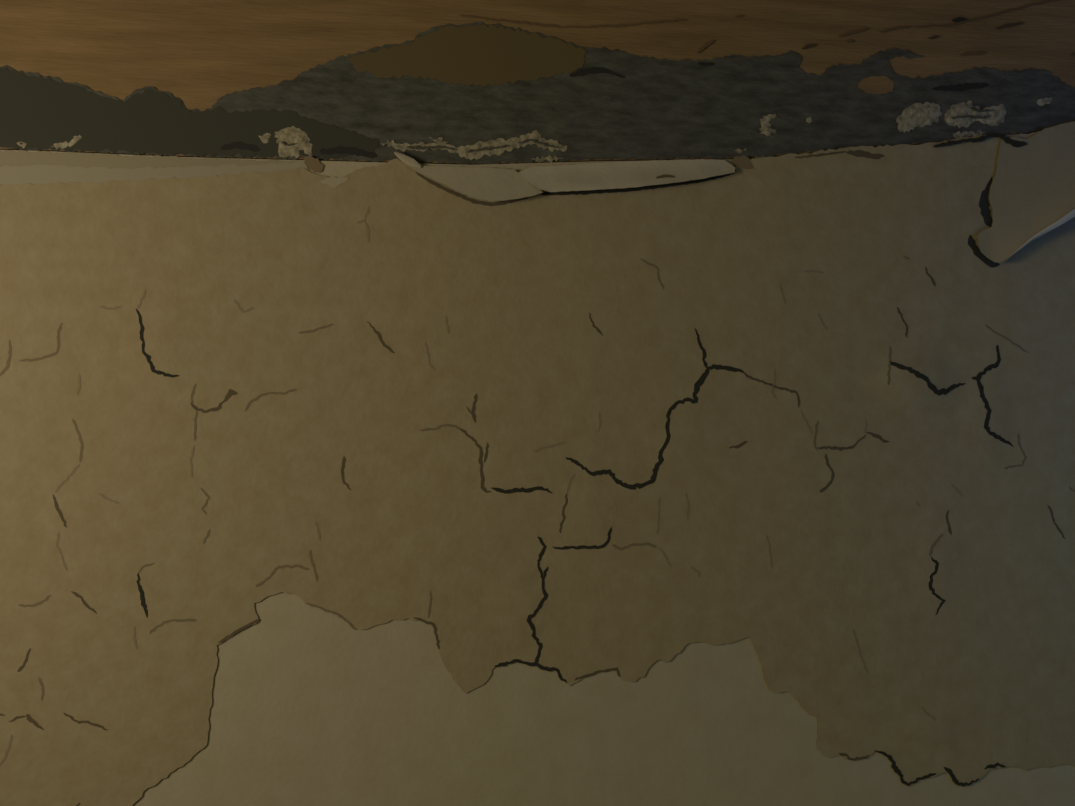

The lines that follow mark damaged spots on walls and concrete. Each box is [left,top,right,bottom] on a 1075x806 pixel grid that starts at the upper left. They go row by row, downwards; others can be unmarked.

peeling [858,76,894,94]
peeling [0,160,308,185]
crack [100,290,297,544]
crack [887,307,1029,469]
crack [18,374,97,614]
crack [132,563,197,649]
crack [218,619,259,643]
crack [255,521,355,630]
crack [420,329,889,683]
crack [929,484,963,615]
crack [0,648,108,766]
crack [839,750,1006,787]